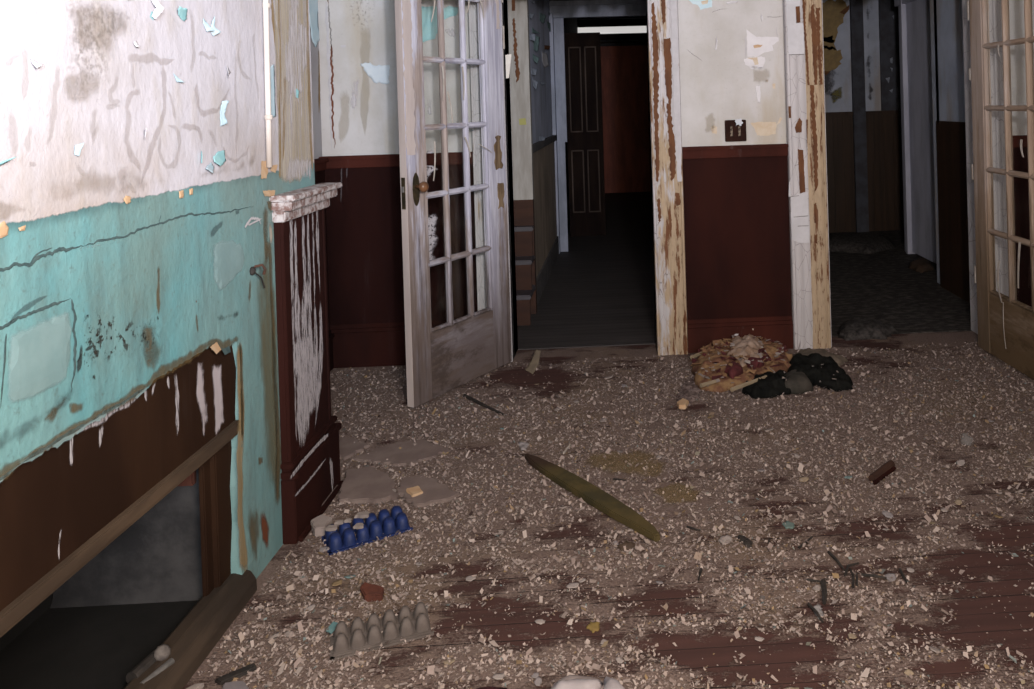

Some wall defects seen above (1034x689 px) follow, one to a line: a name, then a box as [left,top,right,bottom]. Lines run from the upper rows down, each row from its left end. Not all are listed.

peeling [150,0,188,27]
peeling [220,100,229,126]
peeling [651,0,682,206]
peeling [744,0,849,243]
peeling [201,150,226,173]
crack [0,207,248,272]
spalling [0,338,237,483]